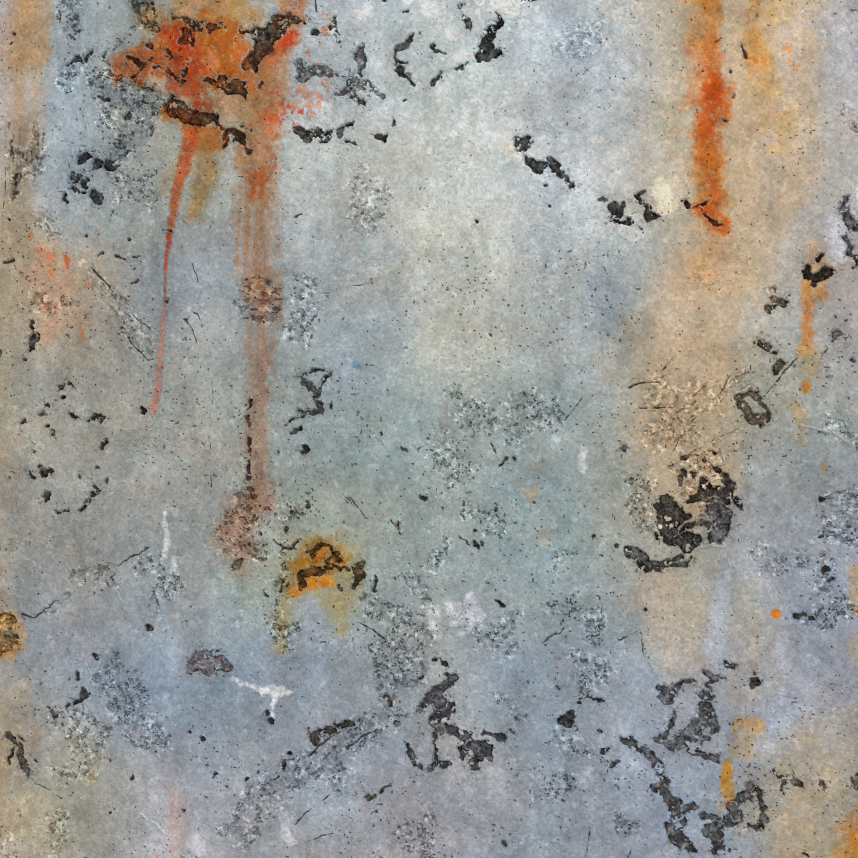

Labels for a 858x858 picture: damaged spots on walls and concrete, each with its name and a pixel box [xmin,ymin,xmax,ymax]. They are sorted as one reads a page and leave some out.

peeling [53,13,253,208]
rust [108,0,336,415]
spalling [202,11,386,106]
spalling [513,131,582,194]
rust [675,0,806,288]
rust [204,306,288,582]
rust [286,533,354,602]
spalling [614,446,743,581]
rust [0,608,29,665]
spalling [403,654,531,779]
spalling [529,594,771,858]
rust [825,803,858,858]